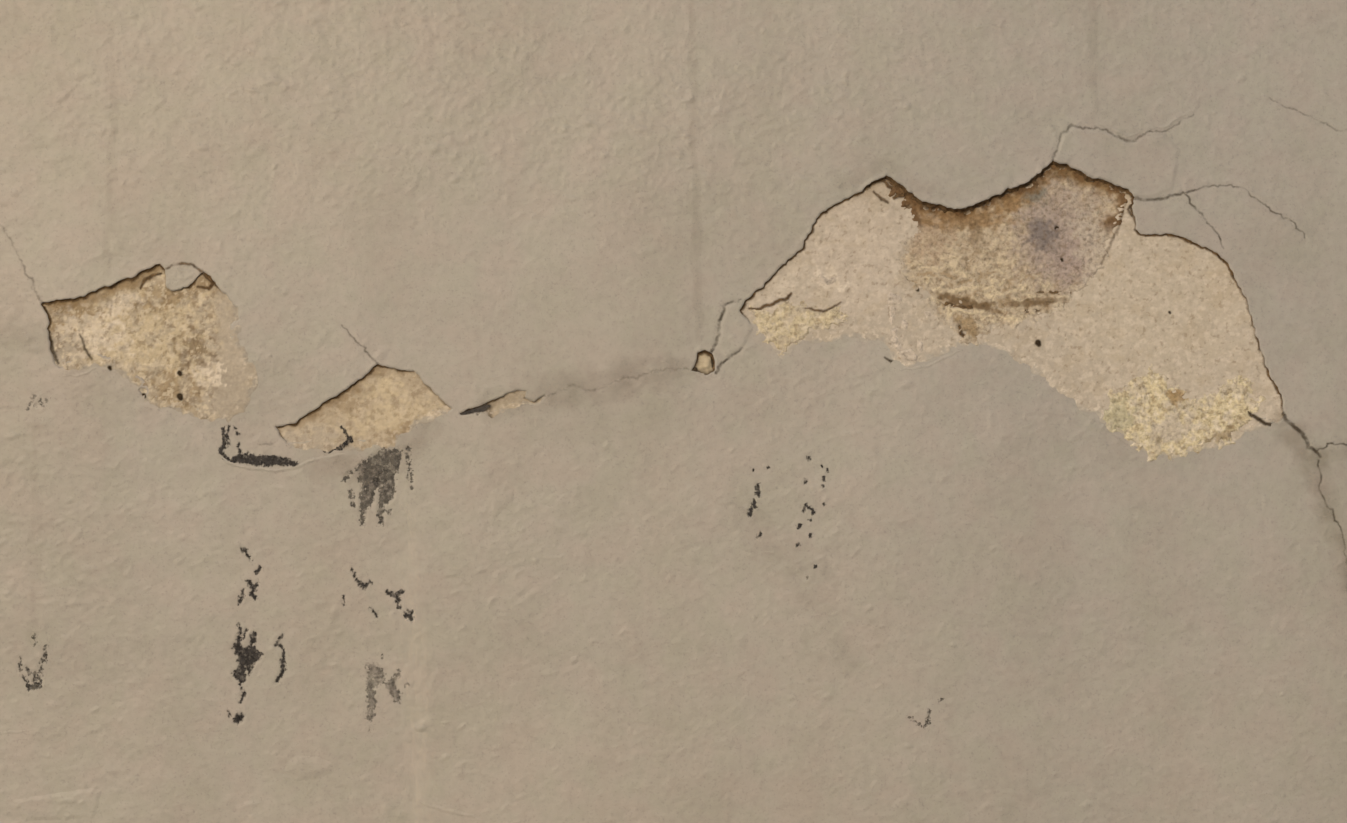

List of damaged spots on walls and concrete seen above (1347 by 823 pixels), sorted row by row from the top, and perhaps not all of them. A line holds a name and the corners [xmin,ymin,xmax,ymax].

spalling [41,262,545,525]
spalling [740,161,1283,462]
crack [1282,413,1344,477]